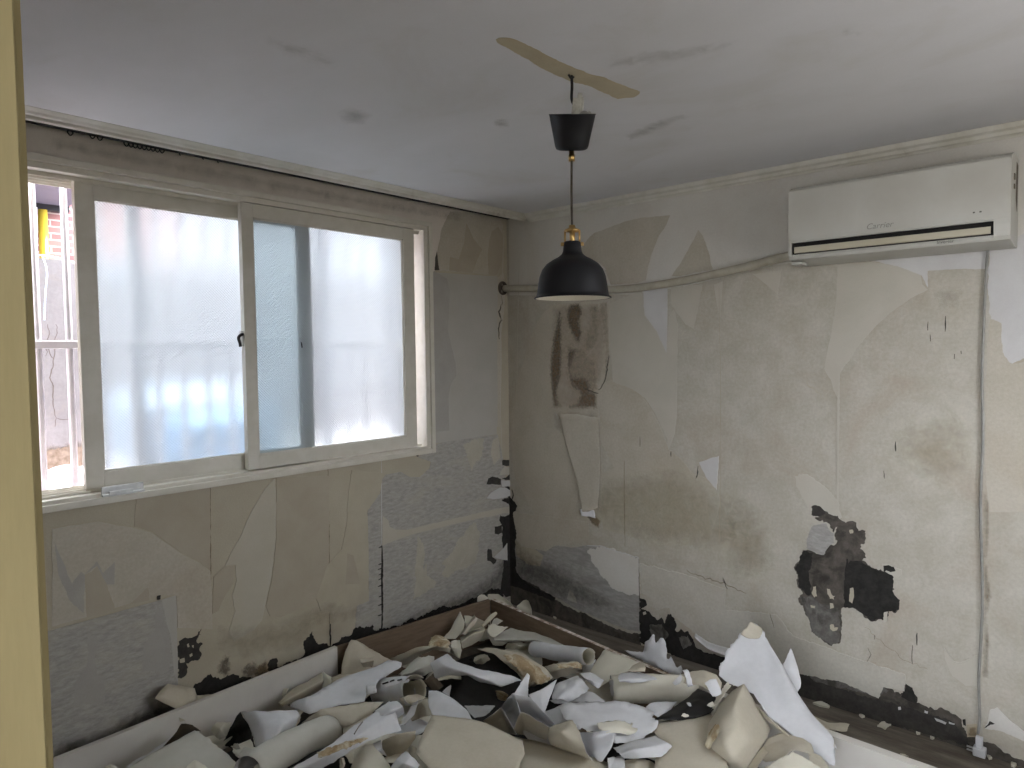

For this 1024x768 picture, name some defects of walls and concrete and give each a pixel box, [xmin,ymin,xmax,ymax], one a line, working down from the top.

leakage [551,305,609,407]
peeling [267,460,729,671]
spalling [794,505,902,646]
peeling [177,630,252,695]
peeling [798,674,1024,767]